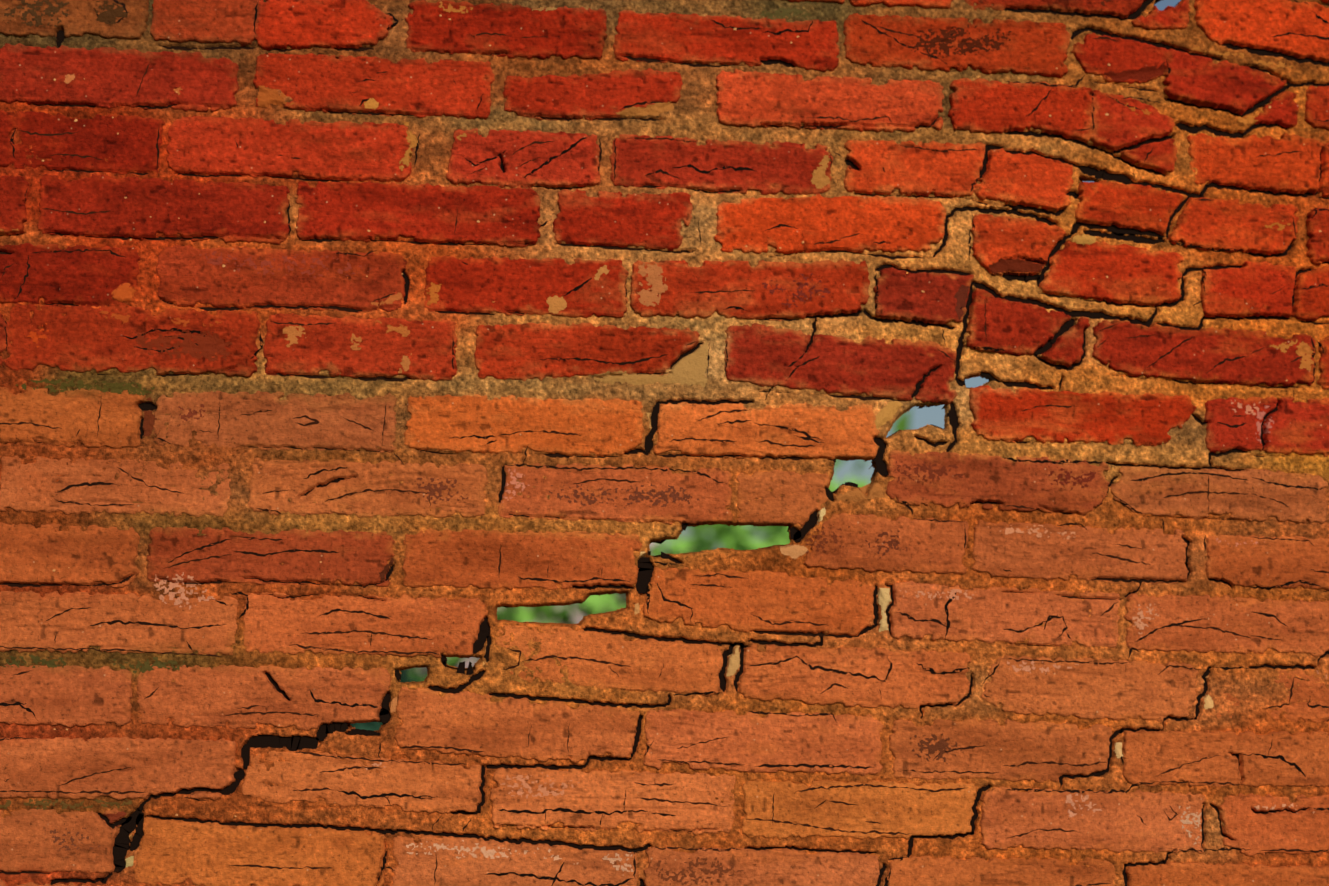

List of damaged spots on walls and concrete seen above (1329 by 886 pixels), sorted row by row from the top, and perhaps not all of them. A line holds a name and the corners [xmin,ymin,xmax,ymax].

crack [252,1,260,34]
crack [385,13,399,31]
crack [352,72,386,106]
crack [153,129,161,167]
crack [285,203,293,235]
crack [452,0,1329,503]
crack [370,271,410,304]
crack [124,328,207,352]
crack [250,321,333,359]